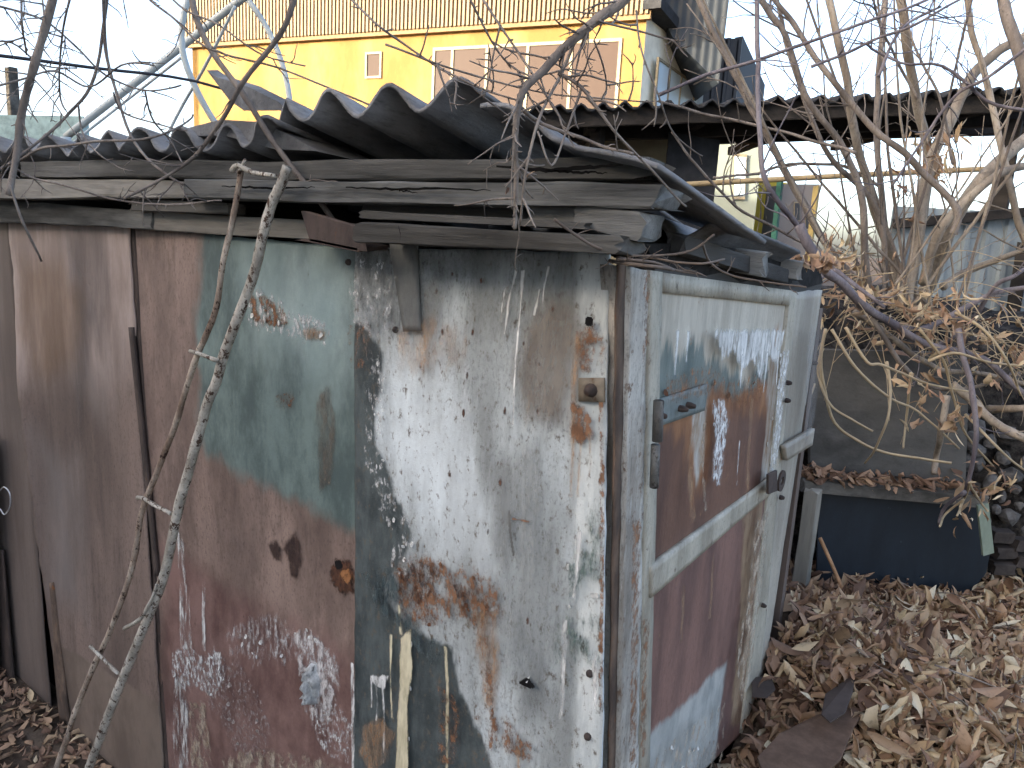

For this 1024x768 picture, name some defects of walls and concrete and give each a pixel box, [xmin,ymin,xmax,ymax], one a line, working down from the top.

crack [346,164,623,193]
peeling [172,532,354,768]
rust [340,568,351,585]
peeling [370,675,388,721]
peeling [362,361,440,666]
rust [393,557,532,768]
rust [570,325,605,708]
rust [737,511,769,698]